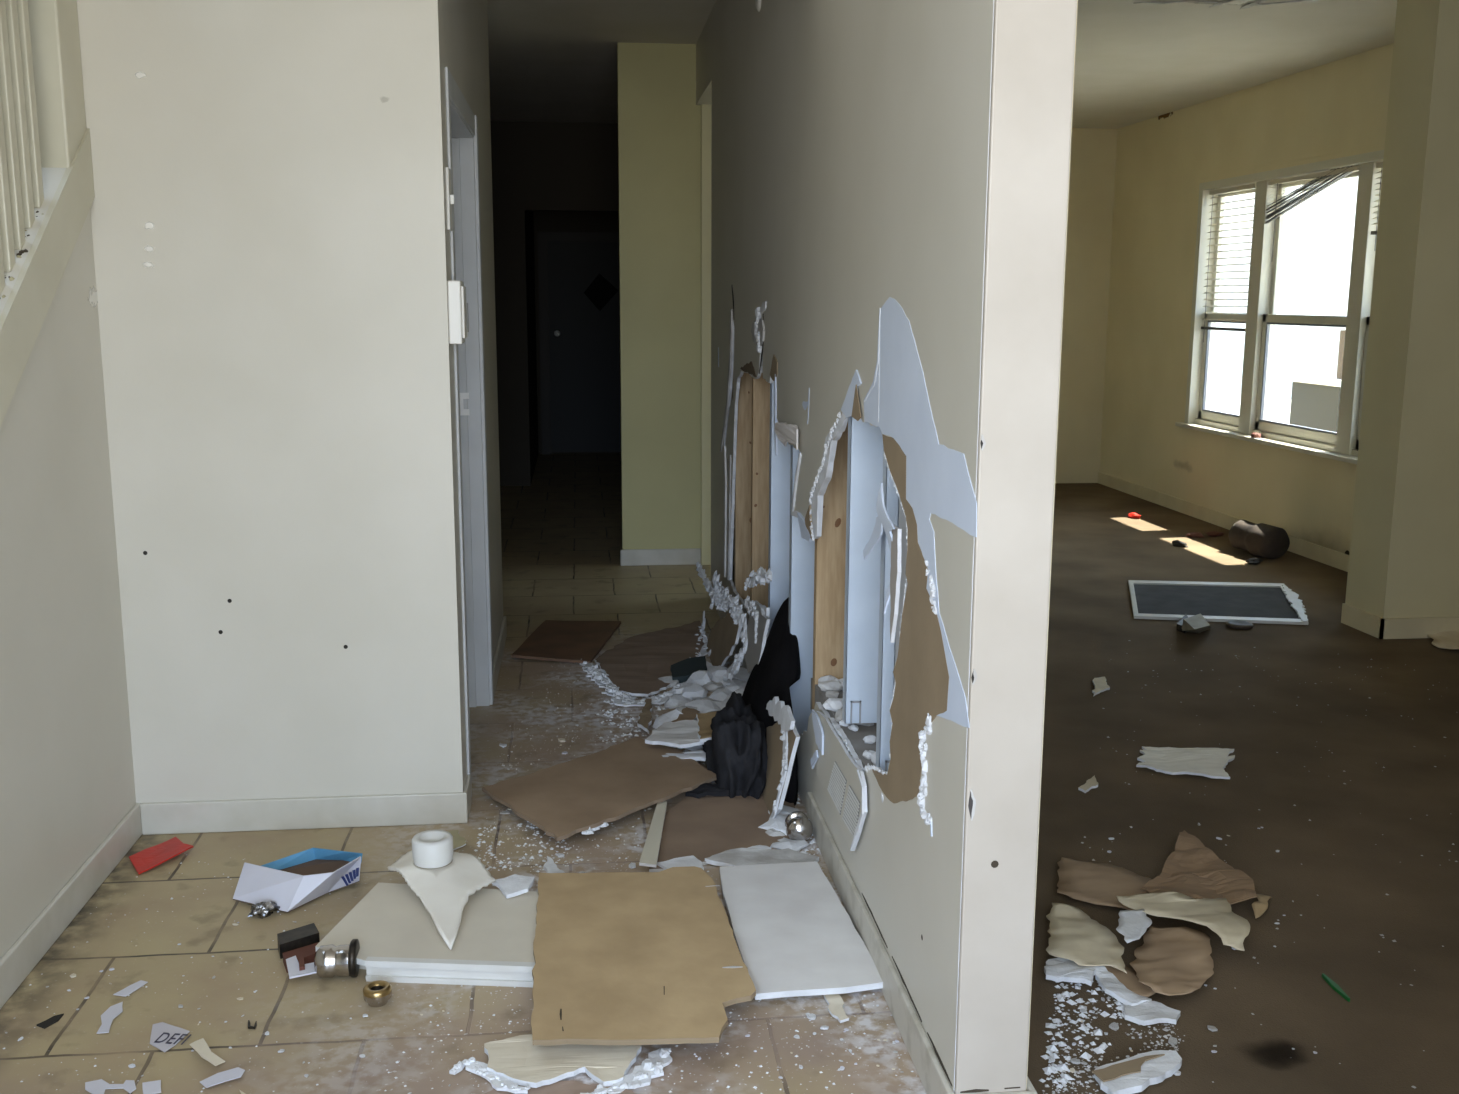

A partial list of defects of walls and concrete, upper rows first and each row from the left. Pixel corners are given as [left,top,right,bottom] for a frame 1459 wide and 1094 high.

flaking render [751,301,767,374]
peeling [791,297,977,837]